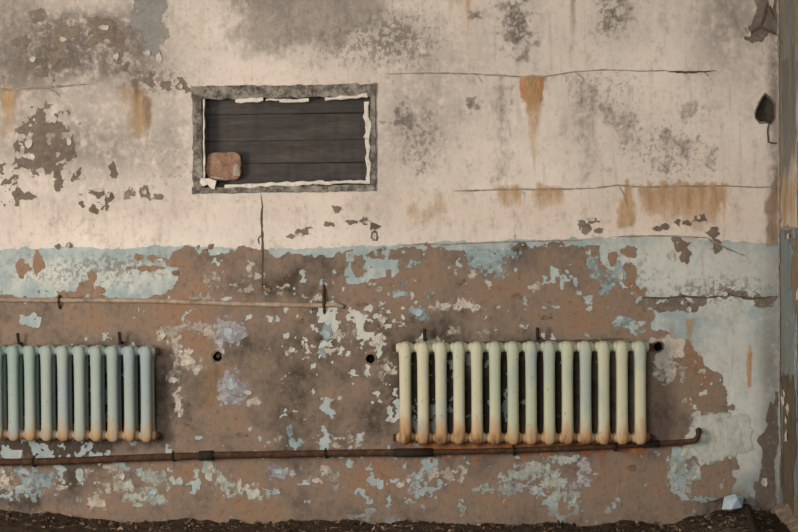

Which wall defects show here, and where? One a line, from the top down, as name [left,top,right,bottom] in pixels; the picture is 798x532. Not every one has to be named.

flaking render [742,0,777,43]
corrosion [520,75,545,113]
crack [393,69,714,86]
leakage [777,0,798,191]
flaking render [0,101,81,207]
peeling [79,185,164,215]
corrosion [620,180,635,227]
corrosion [640,182,725,209]
peeling [716,288,778,308]
peeling [0,214,739,527]
corrosion [405,442,564,459]
flaking render [742,345,798,515]